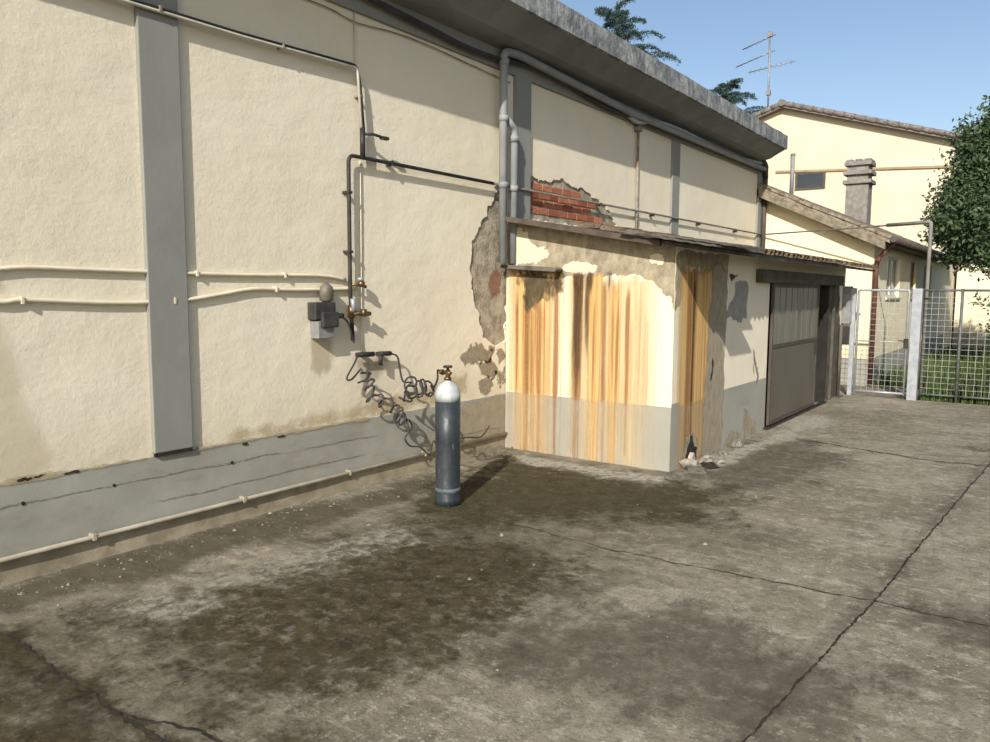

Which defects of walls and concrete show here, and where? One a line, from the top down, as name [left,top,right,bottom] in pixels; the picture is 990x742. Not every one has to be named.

corrosion [512,271,559,450]
peeling [460,176,756,460]
corrosion [570,272,647,461]
corrosion [678,269,712,468]
crack [0,435,377,509]
crack [0,631,223,742]